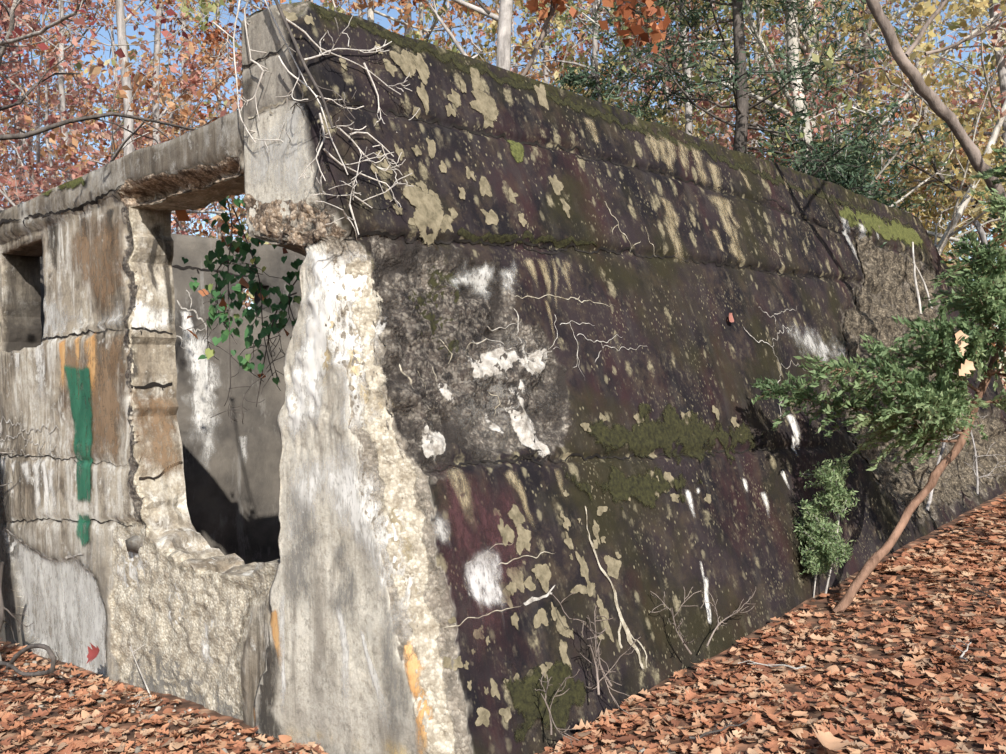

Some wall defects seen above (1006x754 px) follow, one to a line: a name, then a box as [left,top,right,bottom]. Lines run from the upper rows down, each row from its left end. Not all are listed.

crack [131,382,172,390]
leakage [467,338,550,458]
spalling [6,156,273,720]
leakage [421,425,446,461]
leakage [787,415,799,451]
crack [0,454,183,480]
crack [1,518,139,527]
spalling [342,258,553,754]
leakage [524,585,555,605]
leakage [701,563,711,623]
corrosion [270,610,281,656]
corrosion [404,641,432,754]